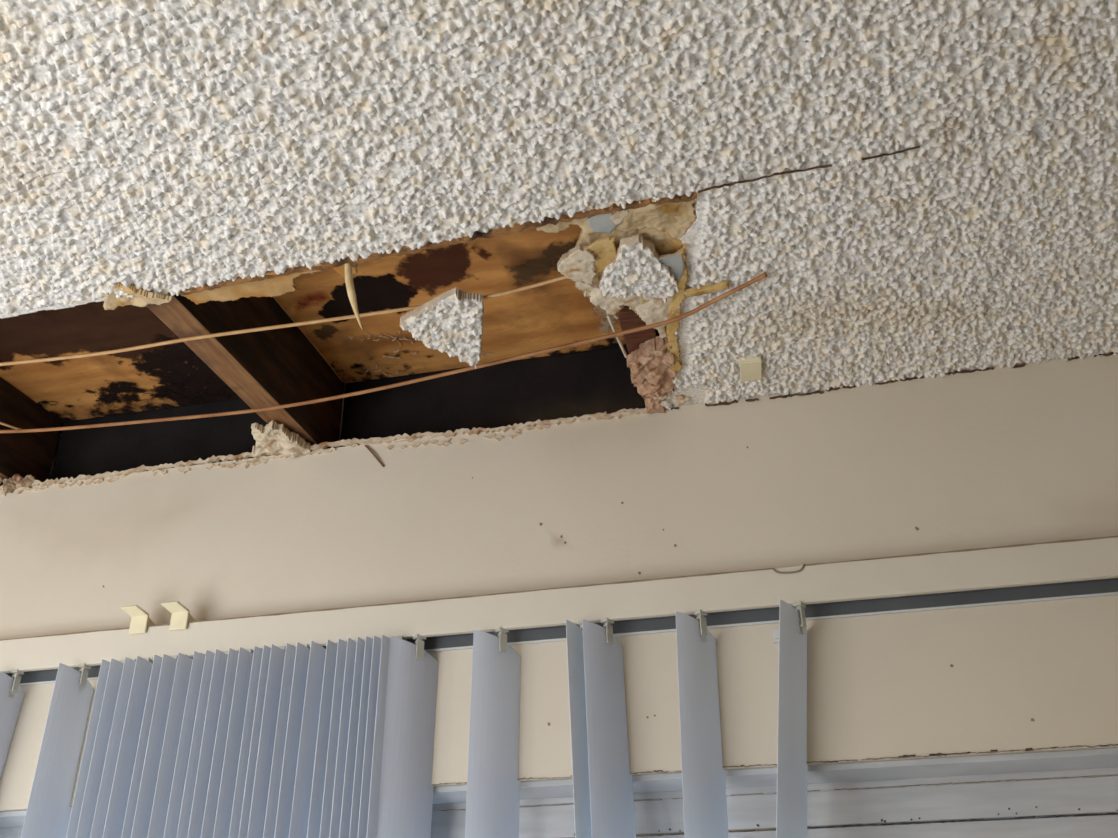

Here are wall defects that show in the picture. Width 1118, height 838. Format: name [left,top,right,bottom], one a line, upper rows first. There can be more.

crack [698,146,920,193]
water stain [505,239,578,286]
flaking render [557,245,597,284]
water stain [313,242,491,340]
water stain [0,301,241,434]
water stain [331,350,431,383]
water stain [549,336,626,356]
flaking render [308,330,676,455]
spalling [0,451,289,496]